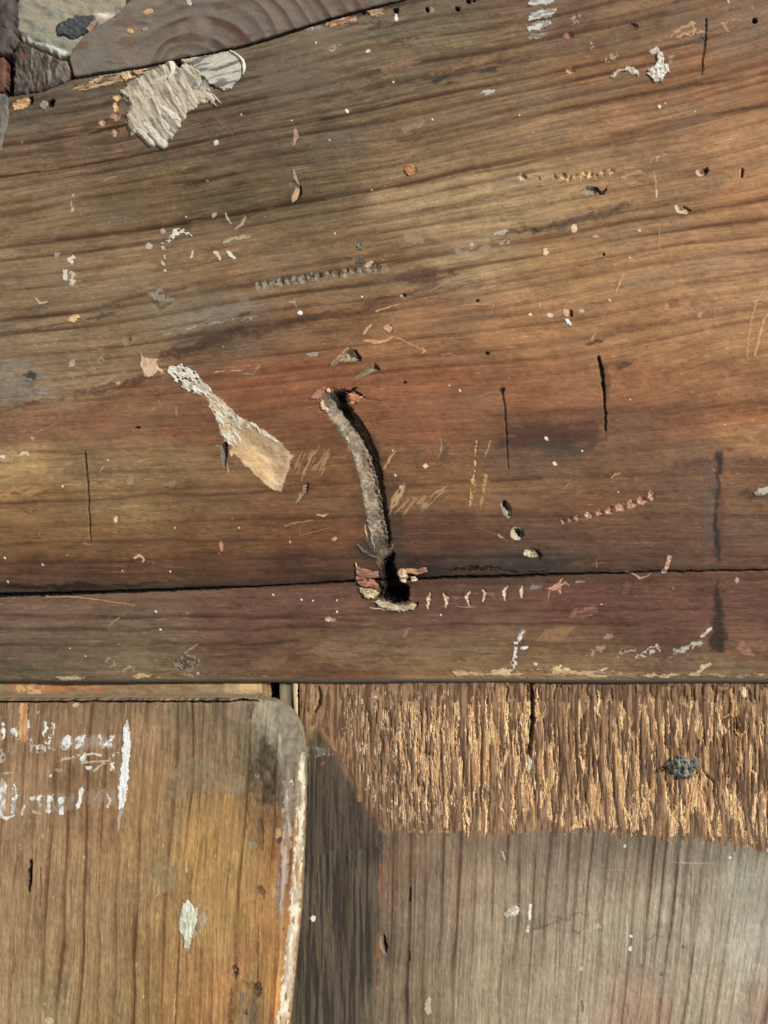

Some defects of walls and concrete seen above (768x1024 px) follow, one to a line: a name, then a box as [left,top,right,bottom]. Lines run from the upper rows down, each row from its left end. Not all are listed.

crack [0,564,768,599]
crack [526,683,536,771]